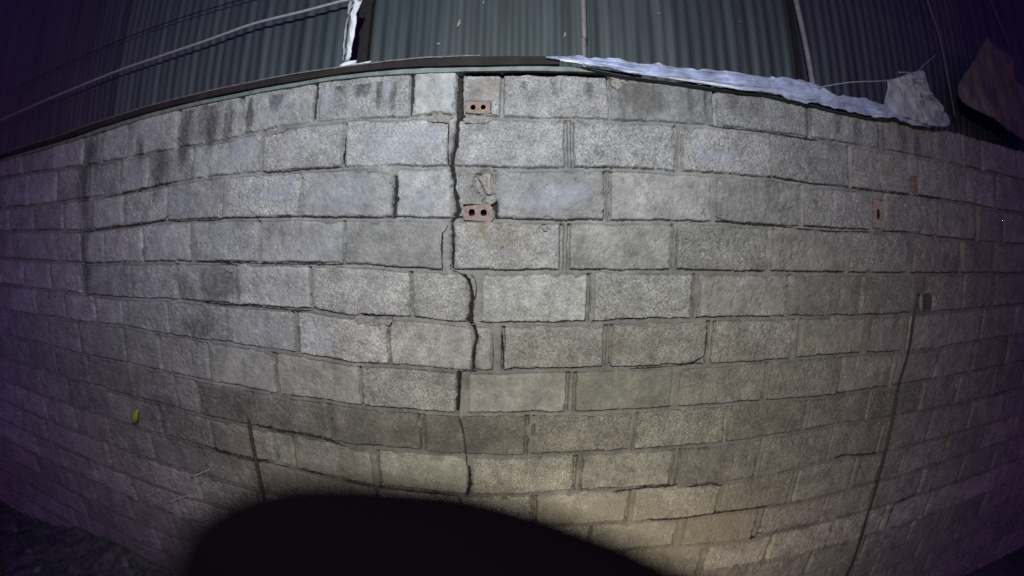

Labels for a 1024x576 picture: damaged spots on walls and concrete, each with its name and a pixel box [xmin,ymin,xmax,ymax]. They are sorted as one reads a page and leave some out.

crack [441,78,505,489]
spalling [475,173,496,205]